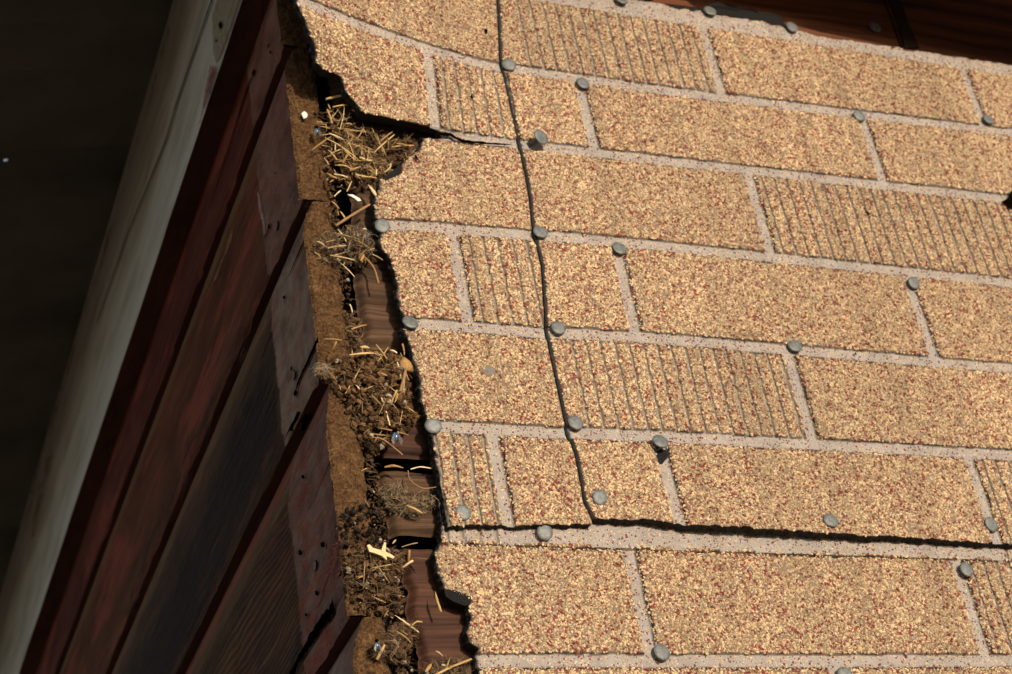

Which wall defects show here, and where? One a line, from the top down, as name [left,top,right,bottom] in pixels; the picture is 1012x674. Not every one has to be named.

crack [437,131,512,145]
crack [284,337,318,441]
crack [289,599,335,674]